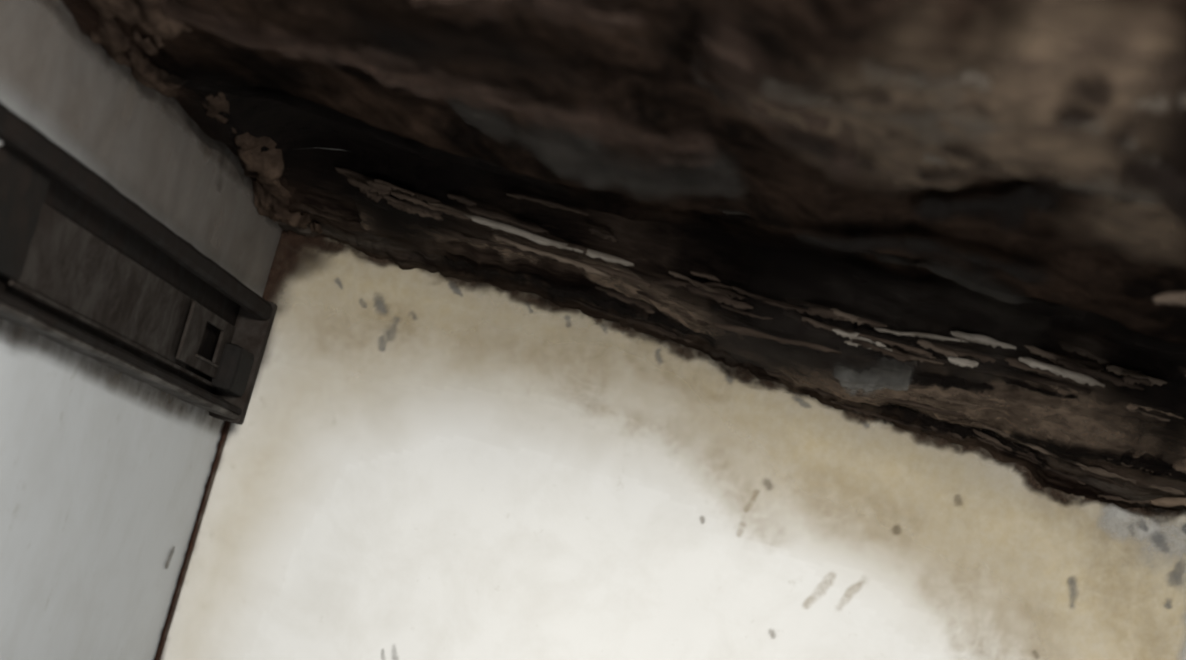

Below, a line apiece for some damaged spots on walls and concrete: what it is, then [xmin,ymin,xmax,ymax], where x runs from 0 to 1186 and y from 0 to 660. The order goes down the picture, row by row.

leakage [61,0,105,50]
peeling [89,0,193,97]
peeling [203,92,323,235]
leakage [168,75,573,241]
peeling [690,0,1186,258]
leakage [262,230,580,337]
leakage [678,222,1047,340]
peeling [713,273,1047,393]
leakage [928,284,1186,455]
peeling [1151,291,1186,306]
leakage [592,317,1186,660]